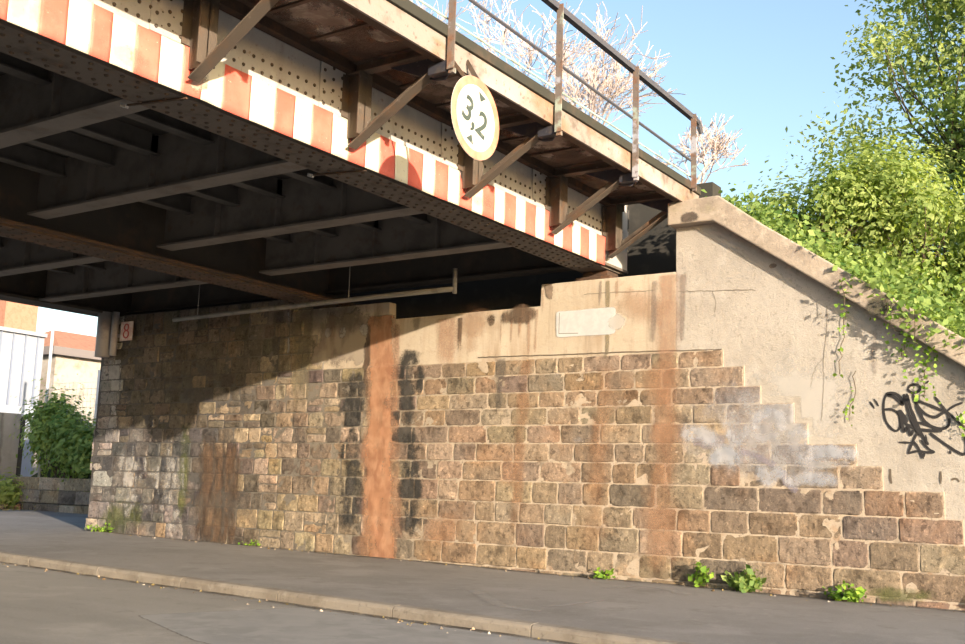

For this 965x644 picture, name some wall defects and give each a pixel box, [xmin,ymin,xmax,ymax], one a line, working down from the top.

rust [363,315,396,559]
water stain [416,366,425,392]